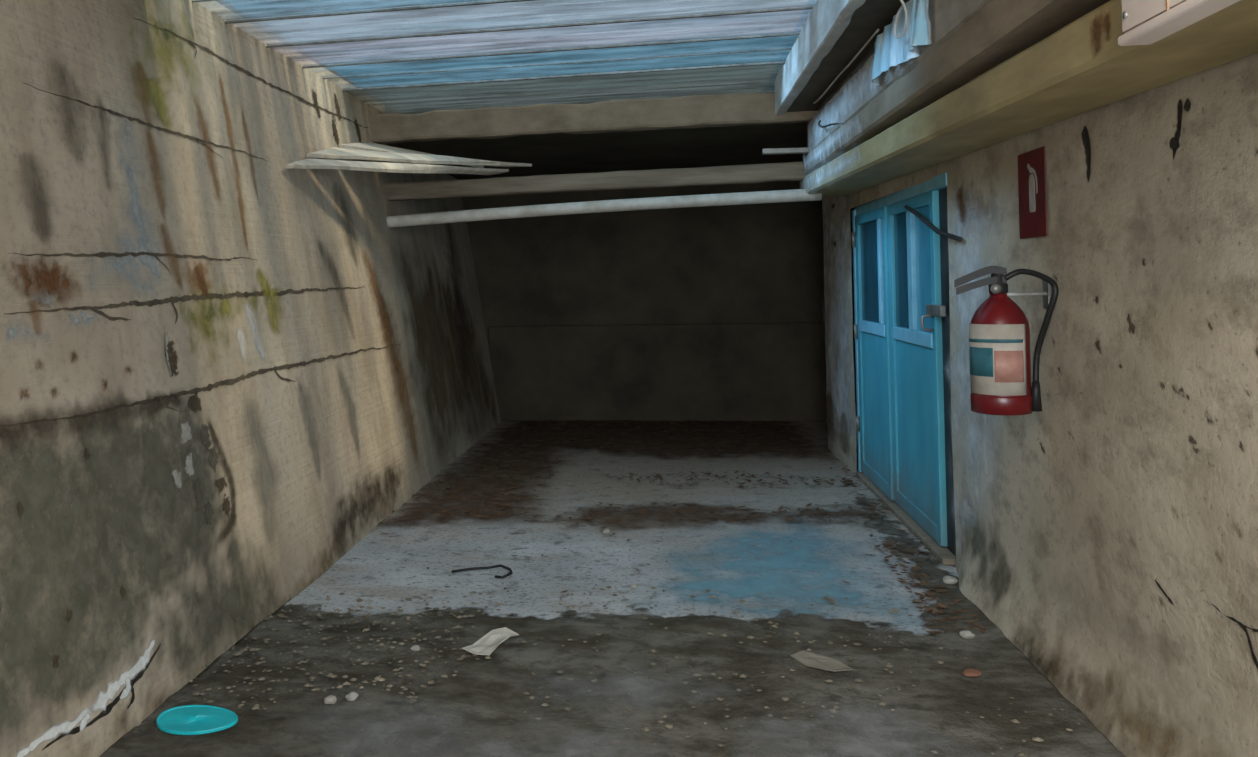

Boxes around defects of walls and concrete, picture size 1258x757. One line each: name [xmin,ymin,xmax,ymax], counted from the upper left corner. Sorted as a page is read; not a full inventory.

corrosion [1093,15,1110,54]
crack [133,18,369,139]
crack [24,83,268,161]
crack [4,251,364,324]
crack [57,343,402,420]
crack [1155,580,1258,669]